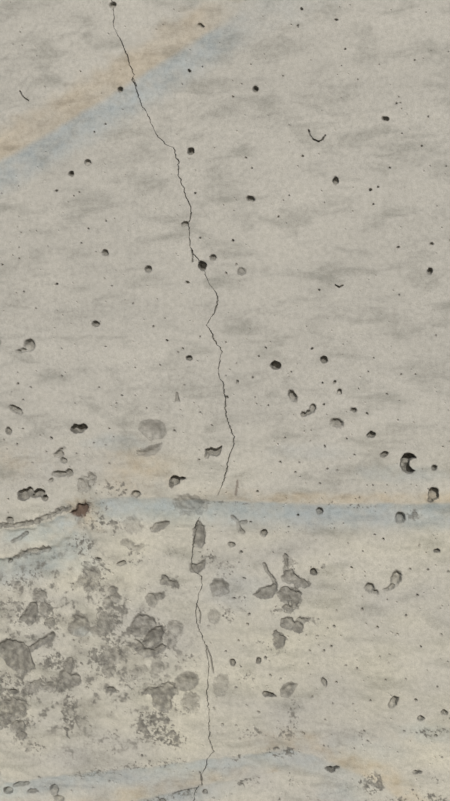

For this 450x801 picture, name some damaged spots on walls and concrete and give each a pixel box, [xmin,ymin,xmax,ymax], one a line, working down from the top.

crack [111,0,235,496]
spalling [0,471,330,781]
crack [172,517,215,801]